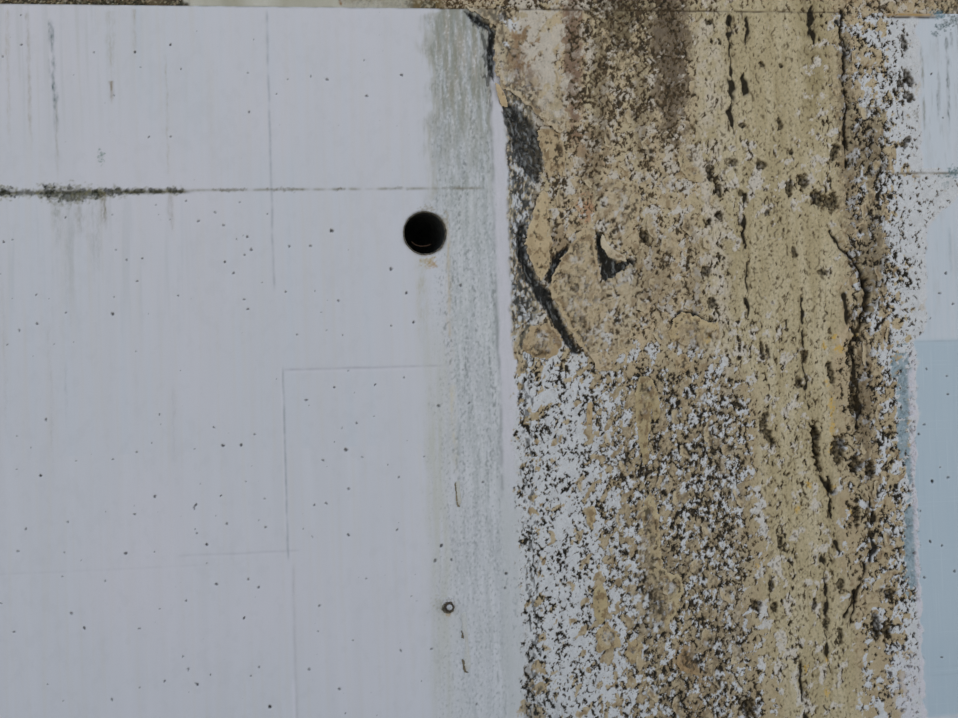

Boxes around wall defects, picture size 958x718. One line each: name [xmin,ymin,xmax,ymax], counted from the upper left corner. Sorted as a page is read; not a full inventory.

water stain [0,0,190,327]
water stain [342,0,699,718]
spalling [464,0,958,718]